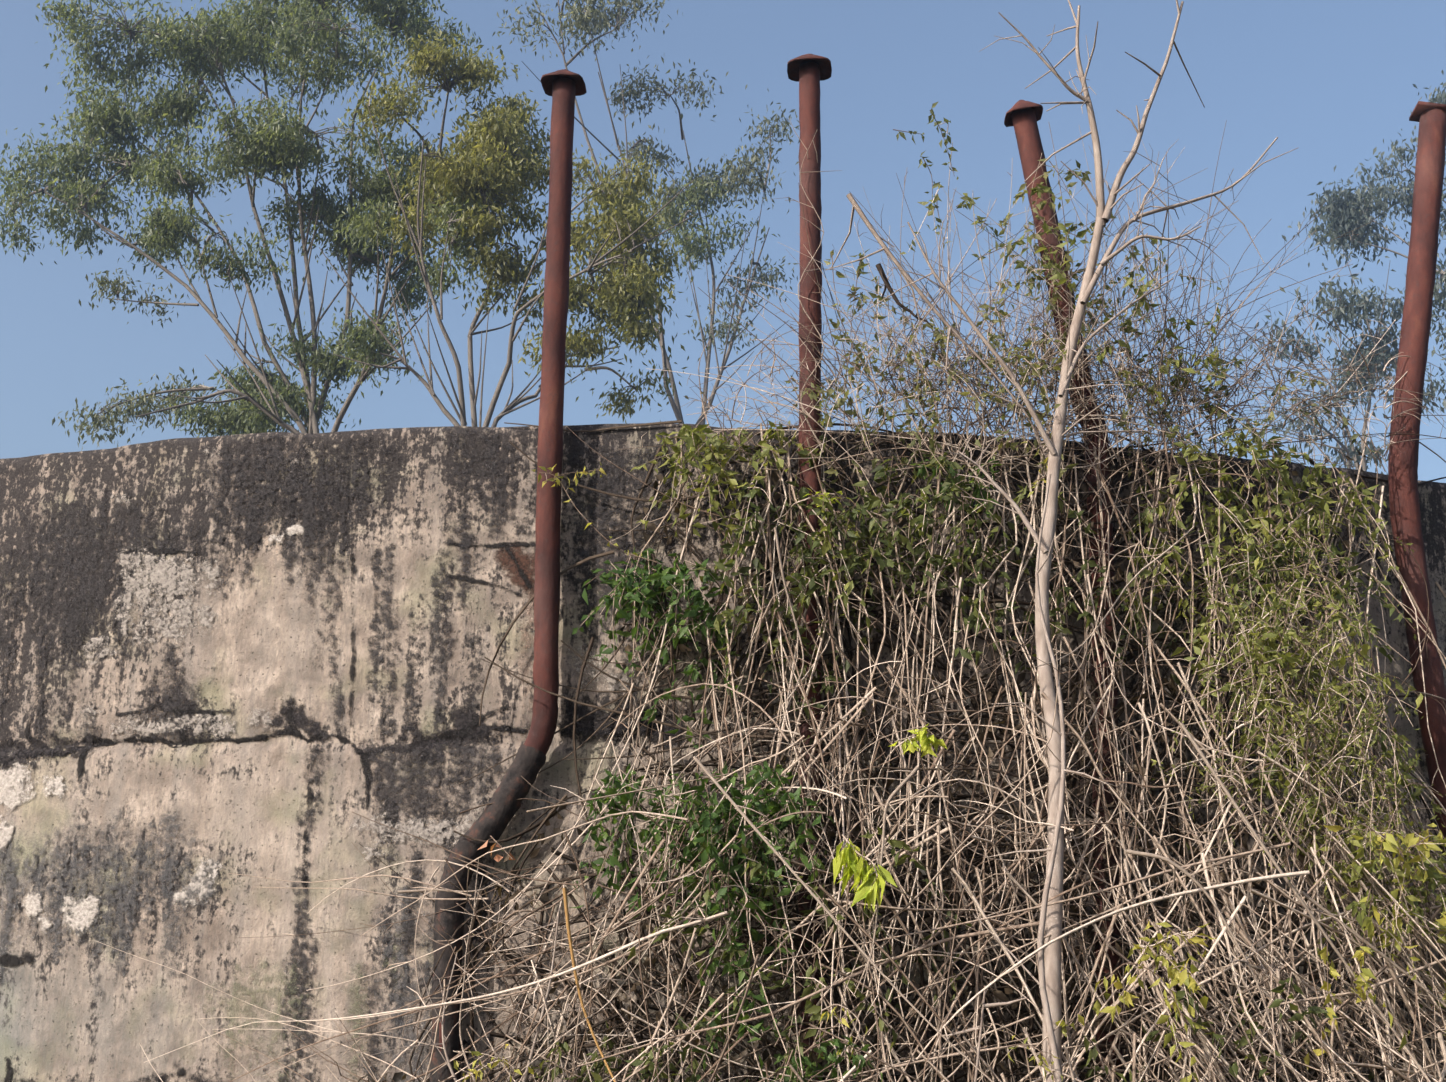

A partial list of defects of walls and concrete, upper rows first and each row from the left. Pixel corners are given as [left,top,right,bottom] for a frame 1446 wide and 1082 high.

water stain [0,435,400,1082]
crack [0,554,694,887]
water stain [348,429,535,1082]